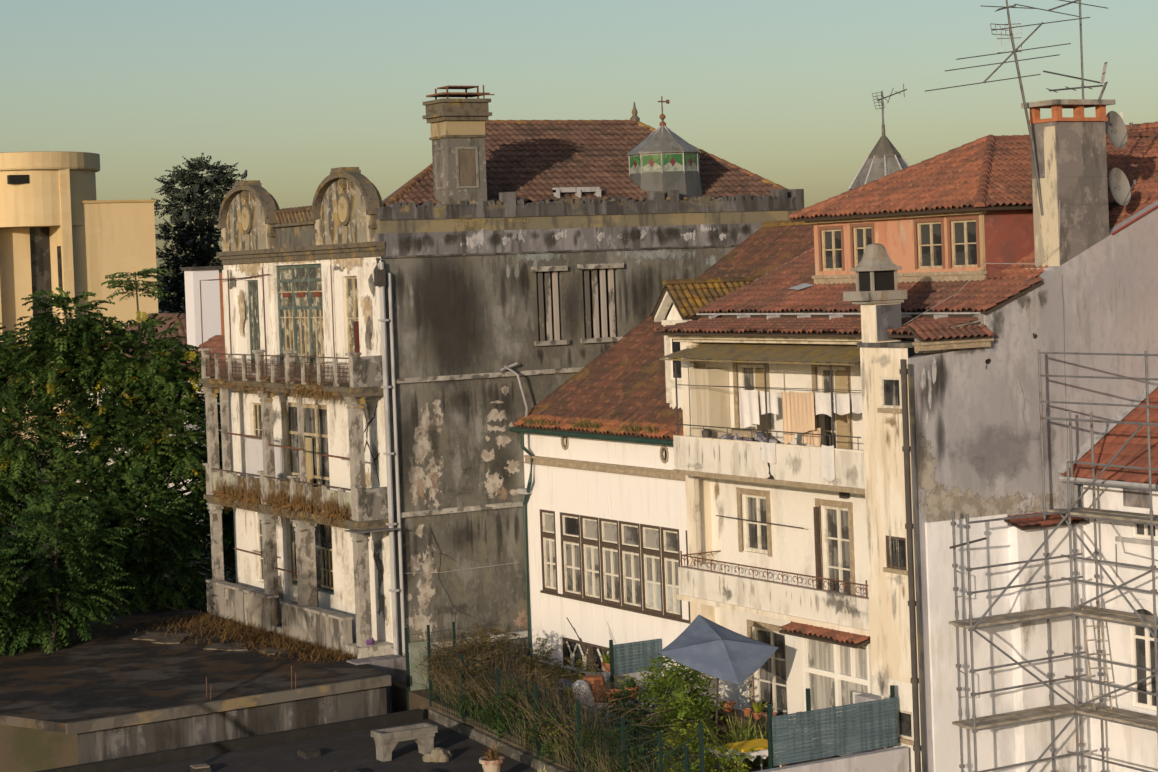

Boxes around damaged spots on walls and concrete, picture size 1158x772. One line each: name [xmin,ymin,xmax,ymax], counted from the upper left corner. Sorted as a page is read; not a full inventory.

peeling [401,399,444,510]
peeling [479,386,520,501]
peeling [373,541,388,625]
water stain [403,531,432,575]
peeling [402,524,437,641]
water stain [454,518,518,552]